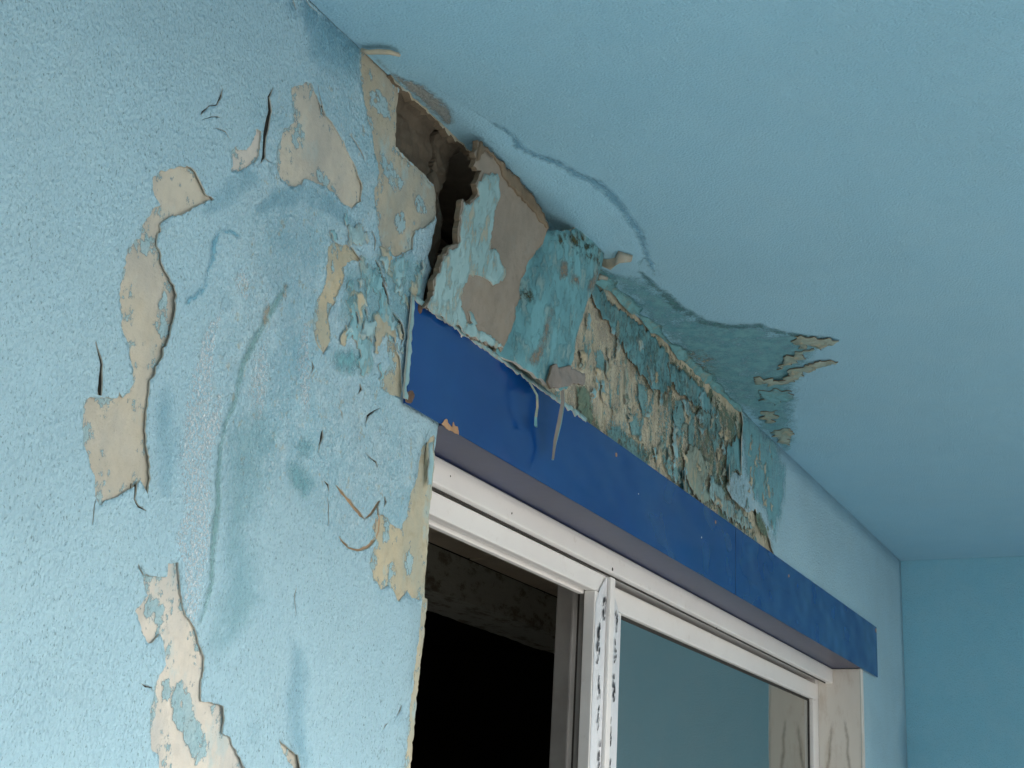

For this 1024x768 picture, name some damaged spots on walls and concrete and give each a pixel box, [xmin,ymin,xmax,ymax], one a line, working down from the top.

peeling [230,130,260,171]
crack [261,92,271,162]
crack [95,351,103,396]
peeling [82,166,212,505]
peeling [276,45,839,553]
water stain [504,129,825,533]
peeling [135,563,243,768]